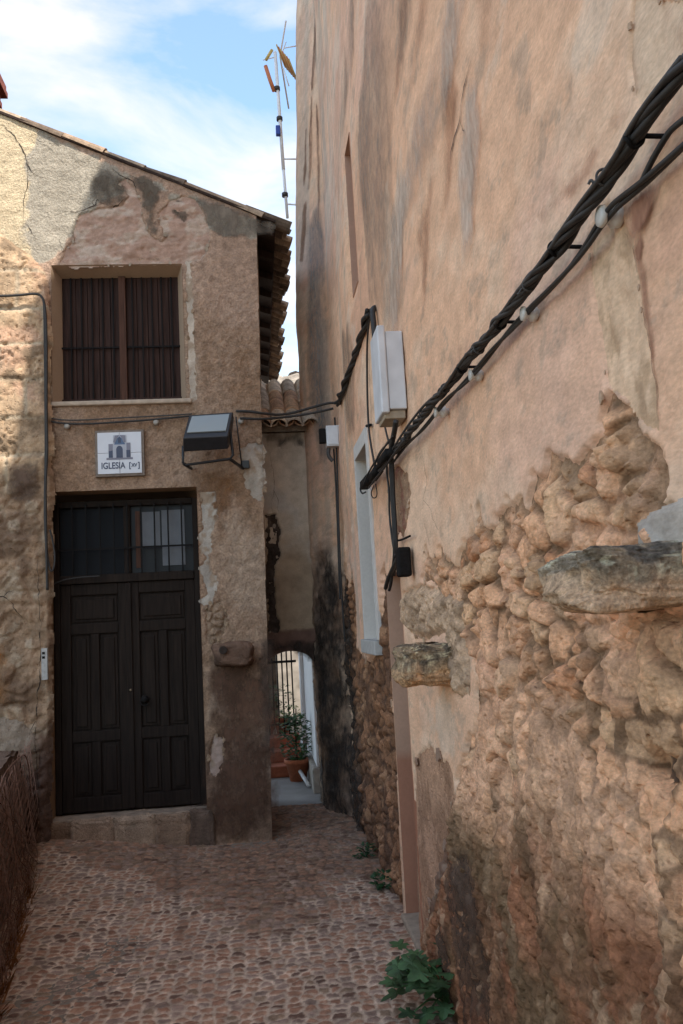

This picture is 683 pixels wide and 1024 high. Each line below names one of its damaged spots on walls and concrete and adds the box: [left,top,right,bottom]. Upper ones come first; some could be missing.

crack [2,124,64,257]
water stain [91,174,160,232]
peeling [60,179,210,404]
peeling [238,438,267,502]
peeling [197,491,229,644]
peeling [206,733,226,776]
water stain [206,551,364,837]
spalling [341,222,683,1024]